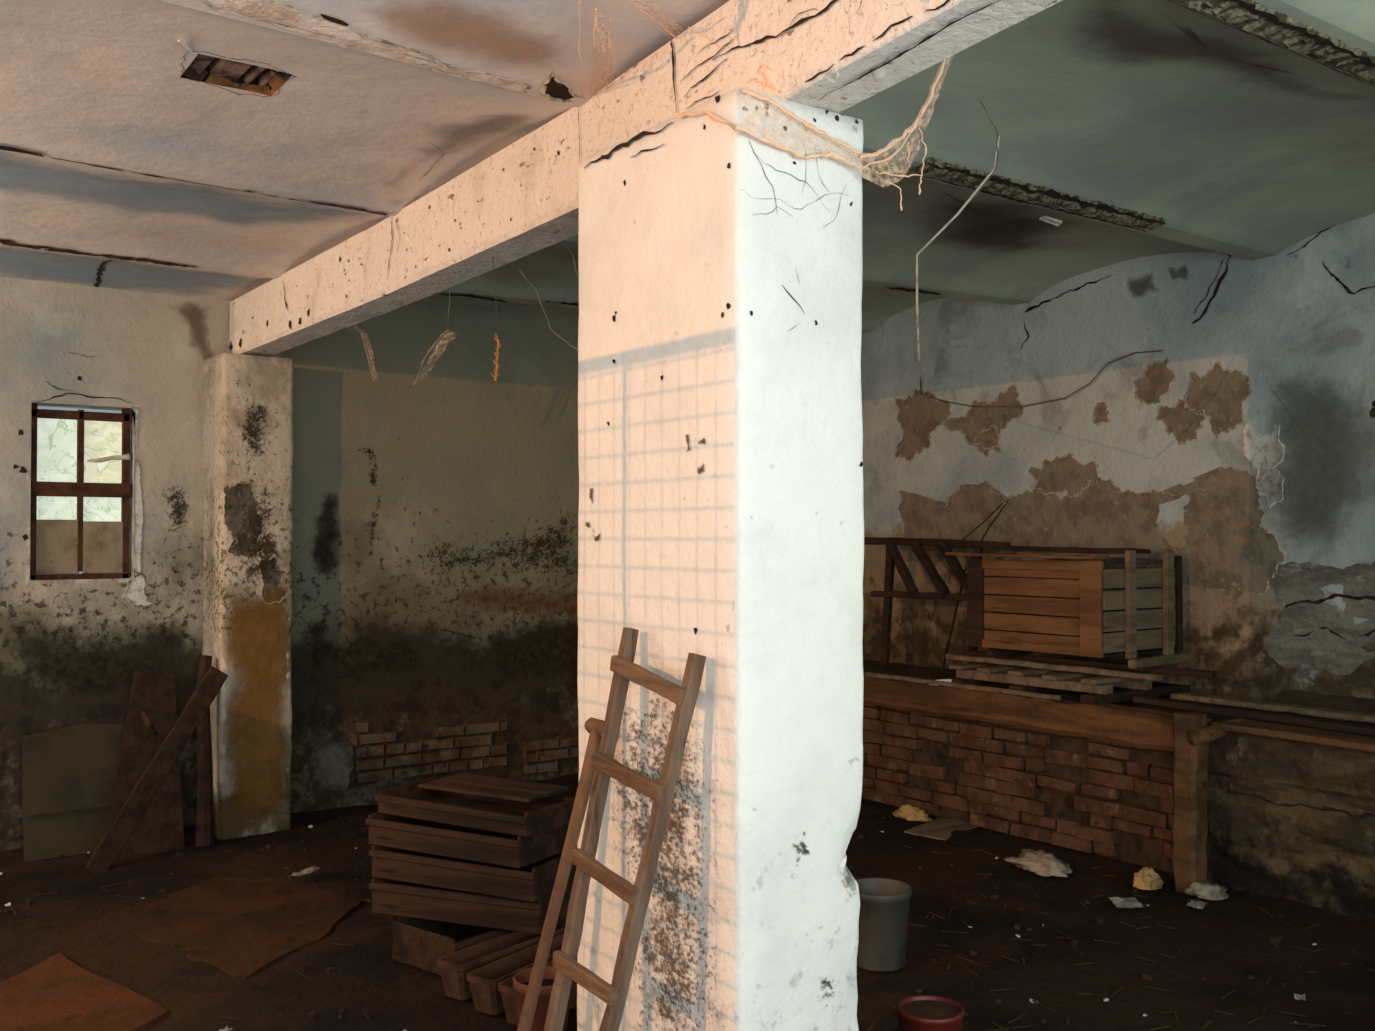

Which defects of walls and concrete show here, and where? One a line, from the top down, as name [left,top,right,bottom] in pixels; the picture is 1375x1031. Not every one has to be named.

flaking render [178,40,297,97]
crack [578,42,677,169]
crack [712,0,837,60]
crack [818,0,1001,101]
spalling [1168,0,1375,86]
crack [0,145,400,277]
spalling [910,157,1166,232]
water stain [1274,390,1364,538]
water stain [312,495,339,574]
peeling [894,358,1375,675]
water stain [479,595,578,675]
water stain [611,699,717,1031]